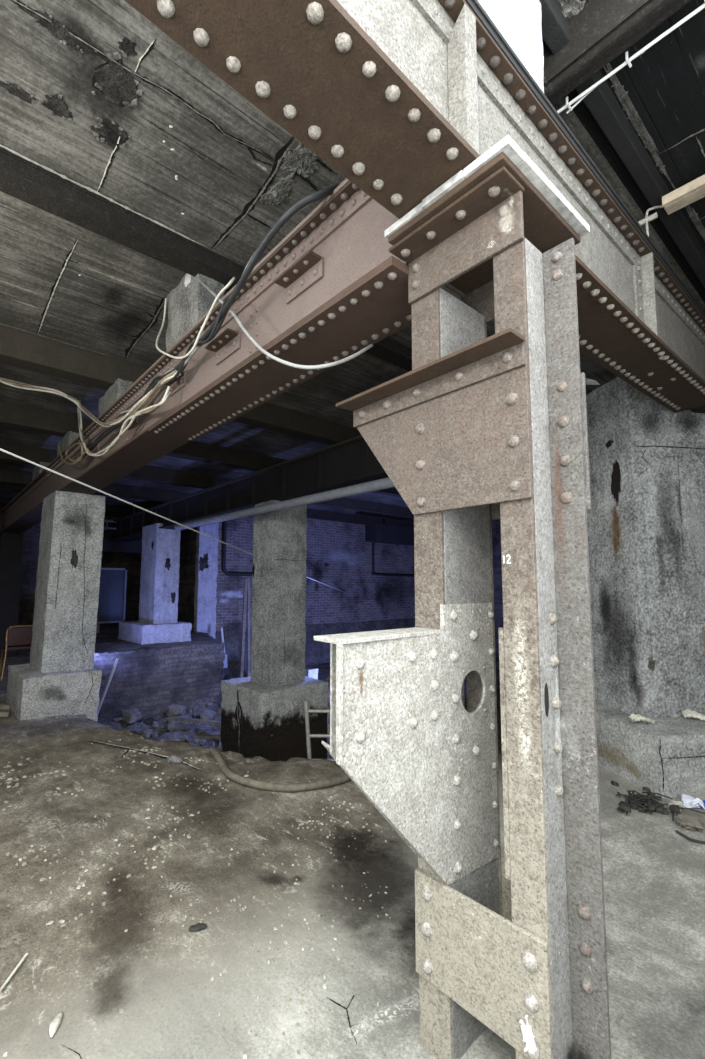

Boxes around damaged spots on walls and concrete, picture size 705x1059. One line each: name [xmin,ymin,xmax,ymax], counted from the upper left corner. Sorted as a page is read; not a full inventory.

spalling [15,0,144,107]
spalling [0,80,73,121]
spalling [87,117,132,151]
crack [11,0,337,250]
spalling [259,143,319,206]
crack [36,238,78,333]
spalling [610,460,622,506]
corrosion [612,511,621,553]
damp [220,706,327,761]
damp [110,877,141,942]
damp [331,833,415,937]
crack [329,996,369,1044]